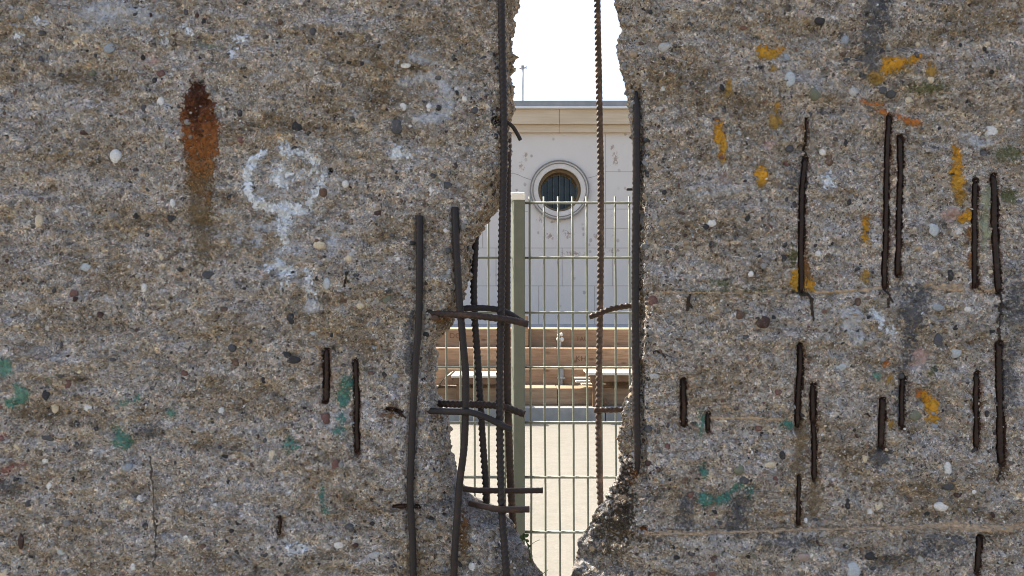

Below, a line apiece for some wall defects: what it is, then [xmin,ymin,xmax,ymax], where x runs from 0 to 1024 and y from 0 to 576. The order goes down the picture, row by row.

rust [177,77,221,267]
spalling [376,0,543,576]
spalling [589,0,641,507]
rust [791,346,823,526]